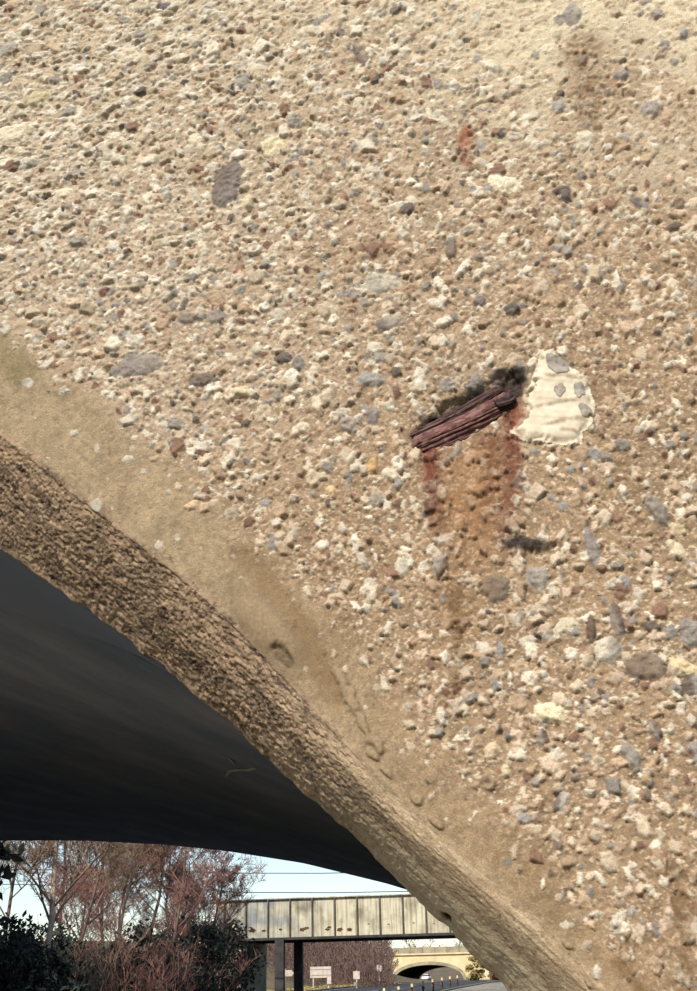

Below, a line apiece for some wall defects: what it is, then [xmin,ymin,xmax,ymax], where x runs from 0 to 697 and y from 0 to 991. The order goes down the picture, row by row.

spalling [410,367,525,453]